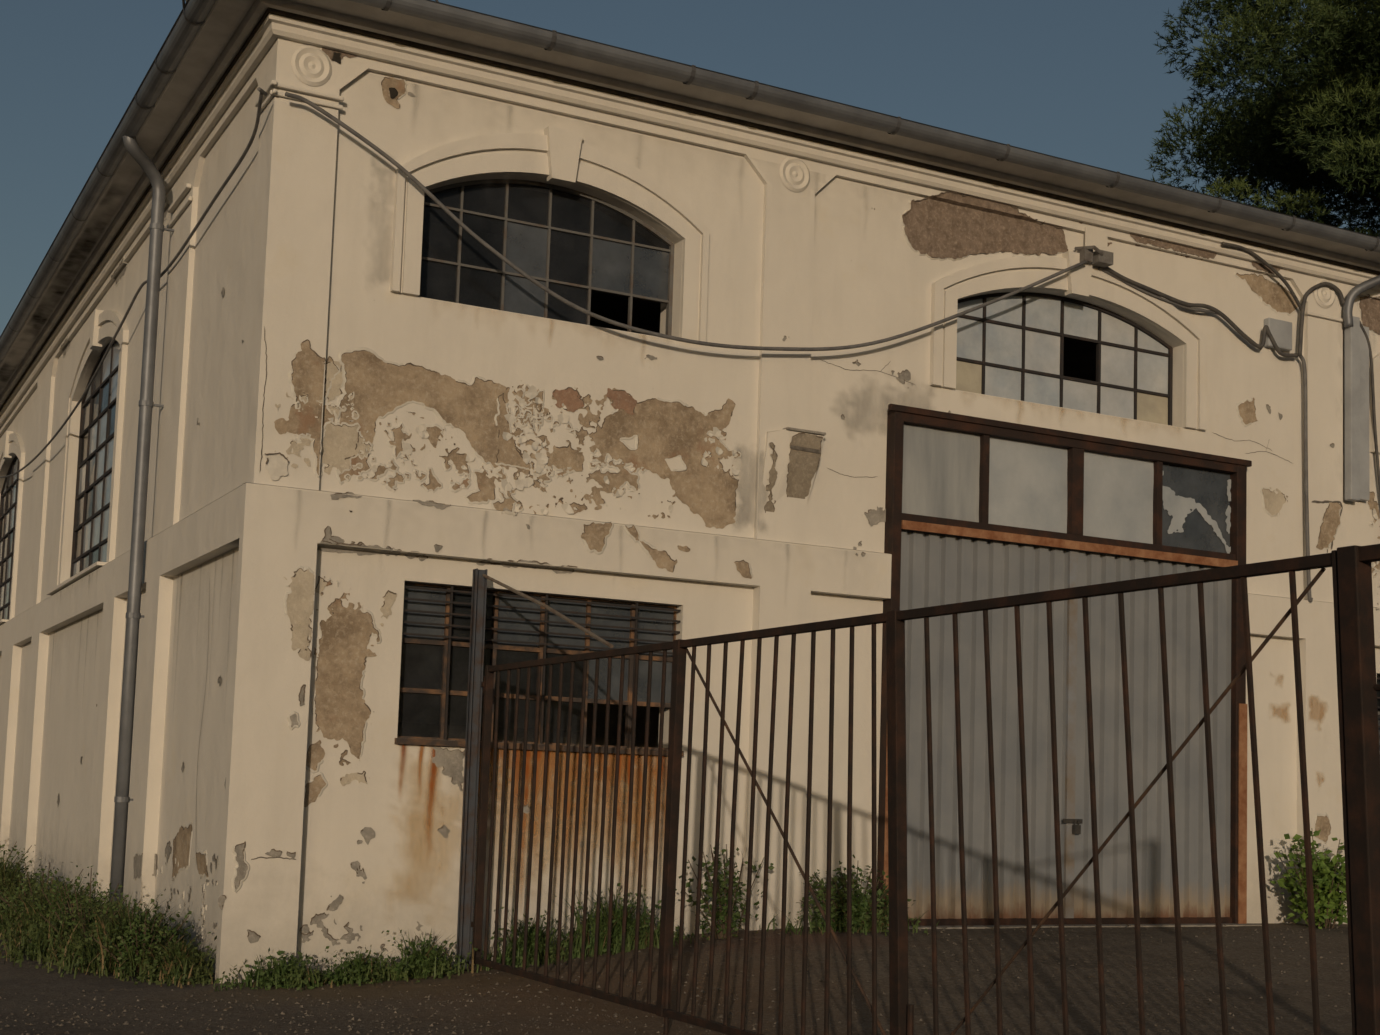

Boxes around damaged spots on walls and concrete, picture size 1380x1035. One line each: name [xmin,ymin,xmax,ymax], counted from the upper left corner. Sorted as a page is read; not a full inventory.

spalling [901,191,1068,261]
spalling [1234,265,1298,316]
spalling [1357,293,1380,335]
peeling [274,339,742,574]
peeling [1371,561,1380,593]
peeling [283,565,397,807]
rust [401,744,437,829]
rust [478,748,668,863]
peeling [133,822,250,940]
peeling [265,849,296,859]
peeling [247,929,261,943]
peeling [300,894,363,949]